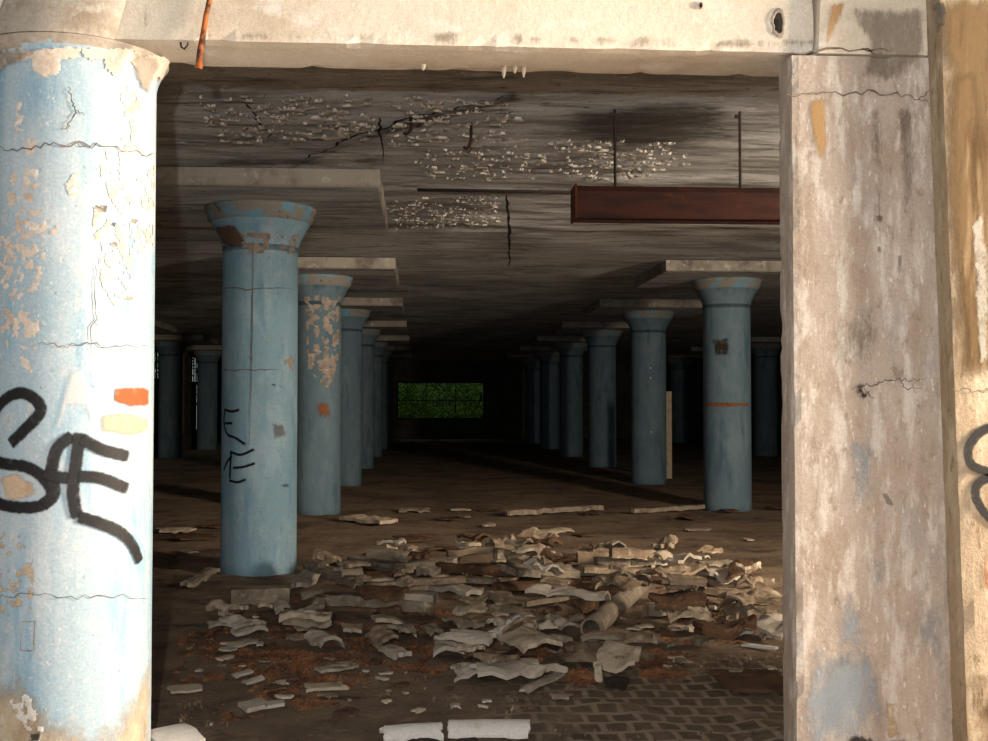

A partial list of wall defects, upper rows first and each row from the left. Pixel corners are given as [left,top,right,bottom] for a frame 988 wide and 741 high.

crack [2,87,155,157]
crack [299,95,517,161]
leakage [199,94,734,182]
crack [787,89,931,107]
peeling [0,46,170,307]
leakage [387,194,502,230]
crack [504,195,512,268]
leakage [943,0,988,374]
peeling [0,168,59,372]
peeling [303,295,341,388]
peeling [0,686,79,741]
peeling [117,675,150,741]